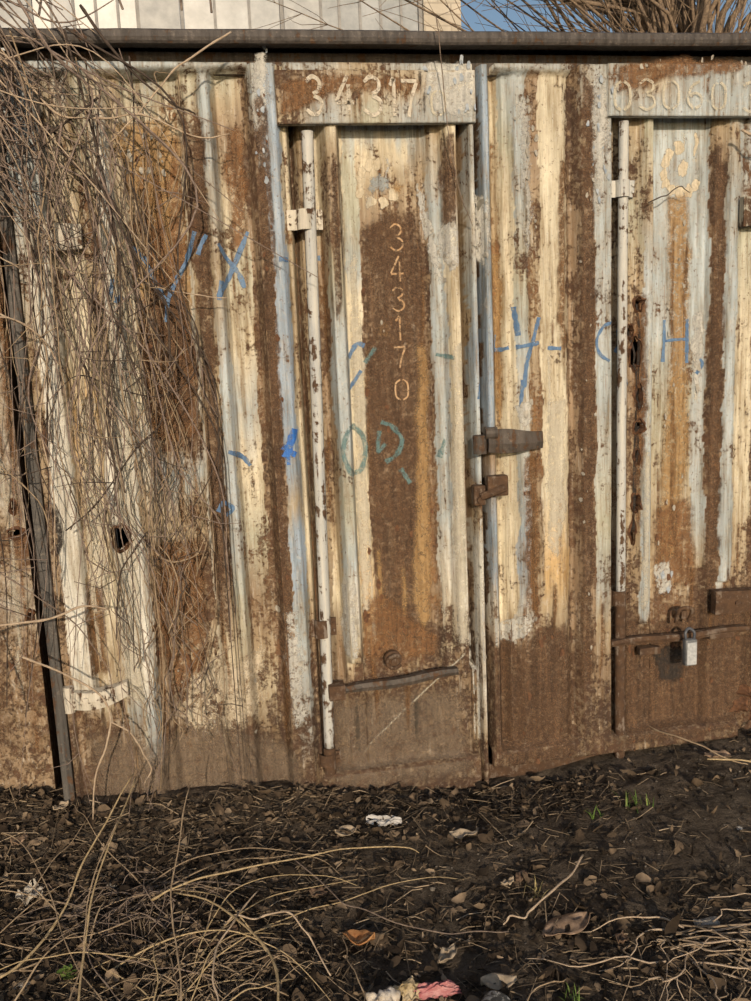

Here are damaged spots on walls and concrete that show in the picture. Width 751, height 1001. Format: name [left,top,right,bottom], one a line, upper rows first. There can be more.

rust [281,75,420,114]
rust [616,55,748,92]
rust [0,283,22,526]
rust [113,118,230,735]
rust [224,93,292,752]
rust [326,436,334,523]
rust [321,162,344,337]
rust [362,213,439,715]
rust [492,255,503,419]
rust [497,80,751,765]